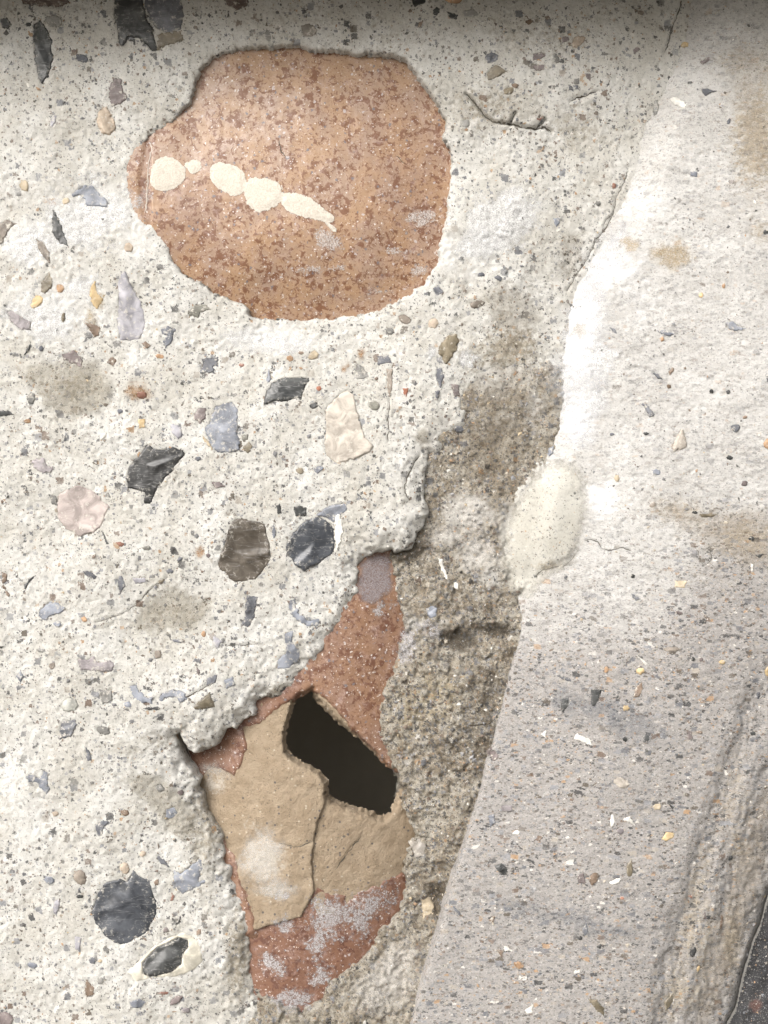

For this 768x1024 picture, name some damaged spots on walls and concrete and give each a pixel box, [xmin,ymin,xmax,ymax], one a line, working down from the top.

crack [467,94,551,132]
leakage [398,618,476,665]
spalling [248,356,566,1024]